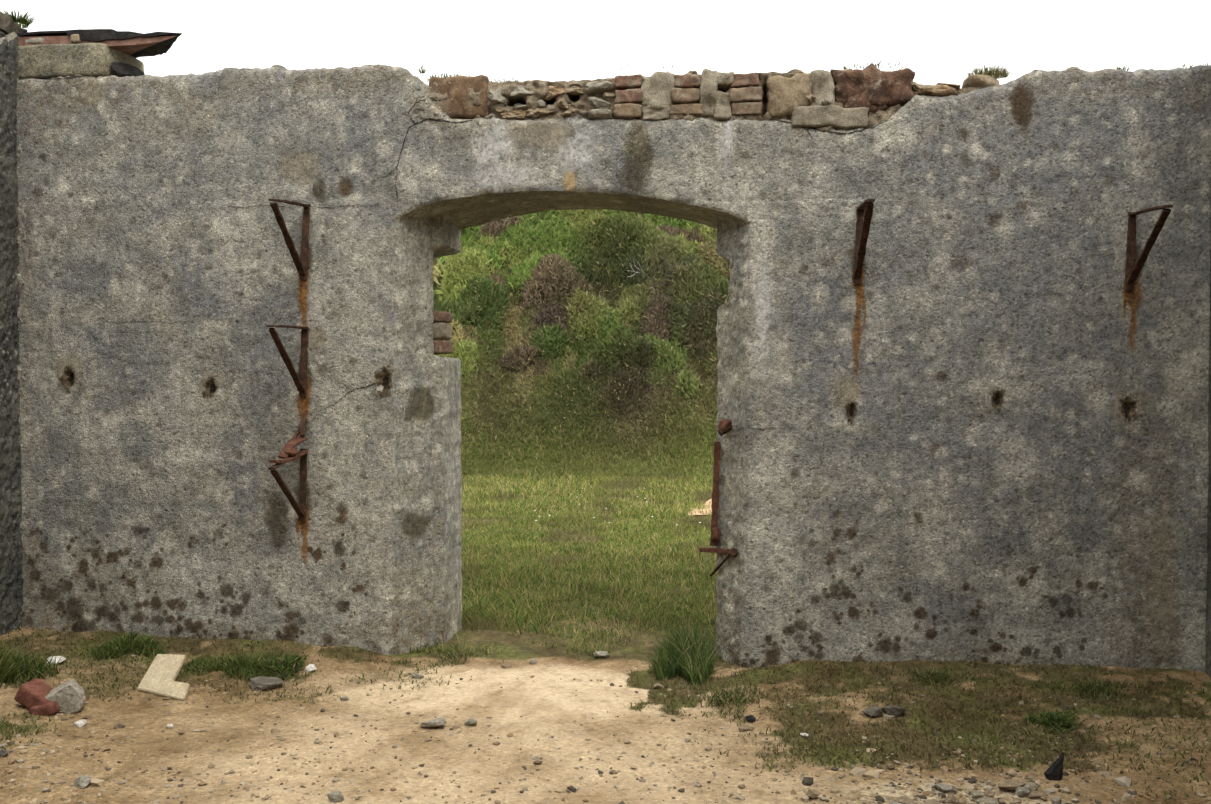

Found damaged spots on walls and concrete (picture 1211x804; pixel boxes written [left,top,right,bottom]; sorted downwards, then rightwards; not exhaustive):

leakage [1009,85,1034,127]
crack [227,99,471,220]
crack [310,383,375,423]